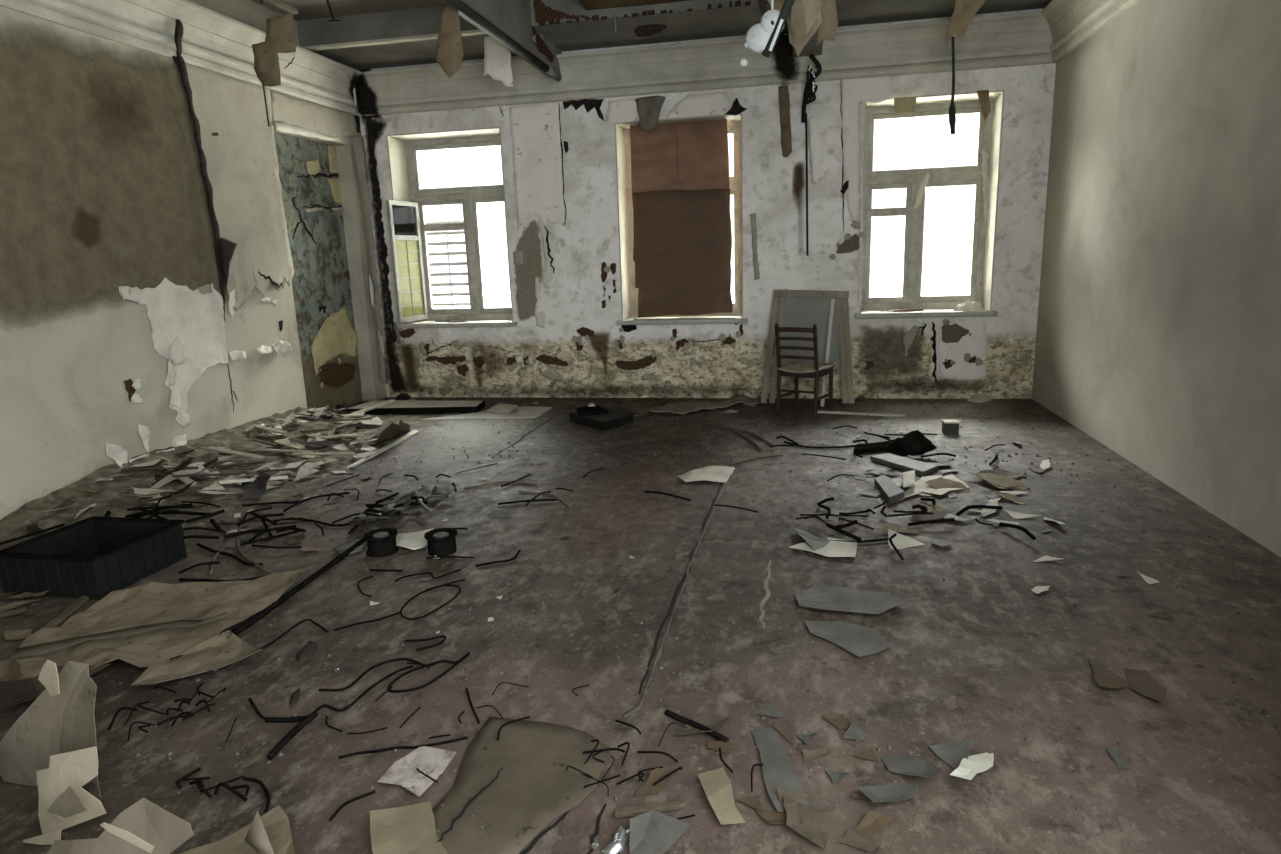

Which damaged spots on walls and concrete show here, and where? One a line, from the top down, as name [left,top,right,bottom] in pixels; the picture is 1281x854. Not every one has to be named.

water stain [0,31,227,321]
flaking render [513,221,546,329]
peeling [106,277,292,467]
peeling [311,306,358,388]
flaking render [398,328,487,380]
flaking render [504,353,568,391]
flaking render [572,327,594,351]
flaking render [615,318,657,380]
flaking render [670,329,697,365]
flaking render [719,323,744,348]
peeling [880,309,919,357]
peeling [937,319,988,383]